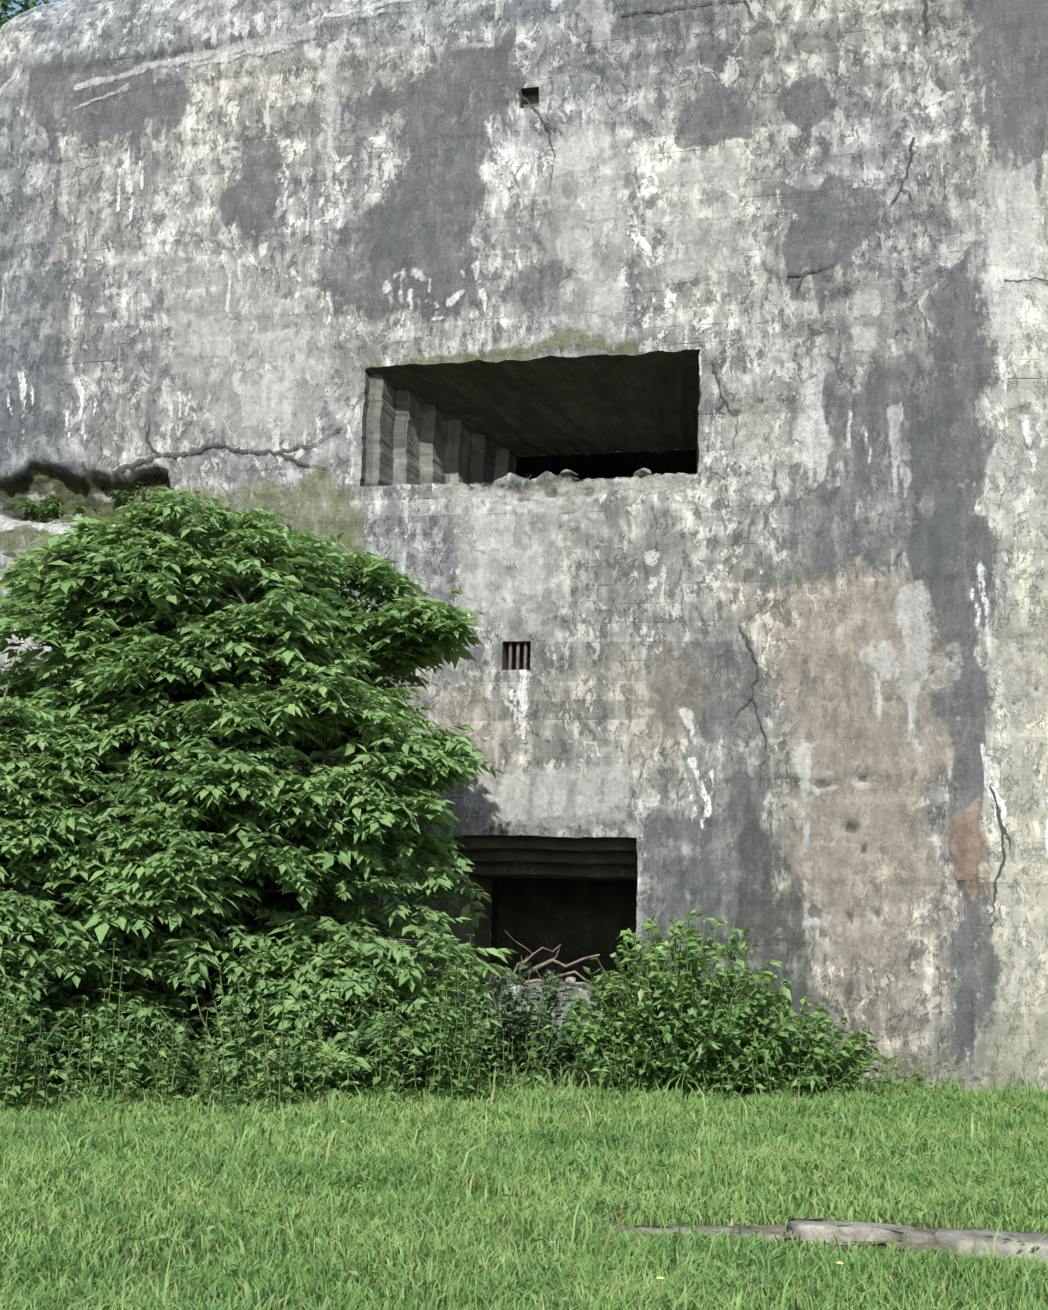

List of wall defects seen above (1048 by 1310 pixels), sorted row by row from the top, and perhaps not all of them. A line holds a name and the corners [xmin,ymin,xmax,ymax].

crack [922,0,930,31]
damp [966,0,1048,208]
crack [111,416,342,477]
spalling [0,467,171,530]
damp [510,670,527,739]
damp [908,241,1042,1069]
rust [946,800,990,902]
crack [989,786,1012,931]